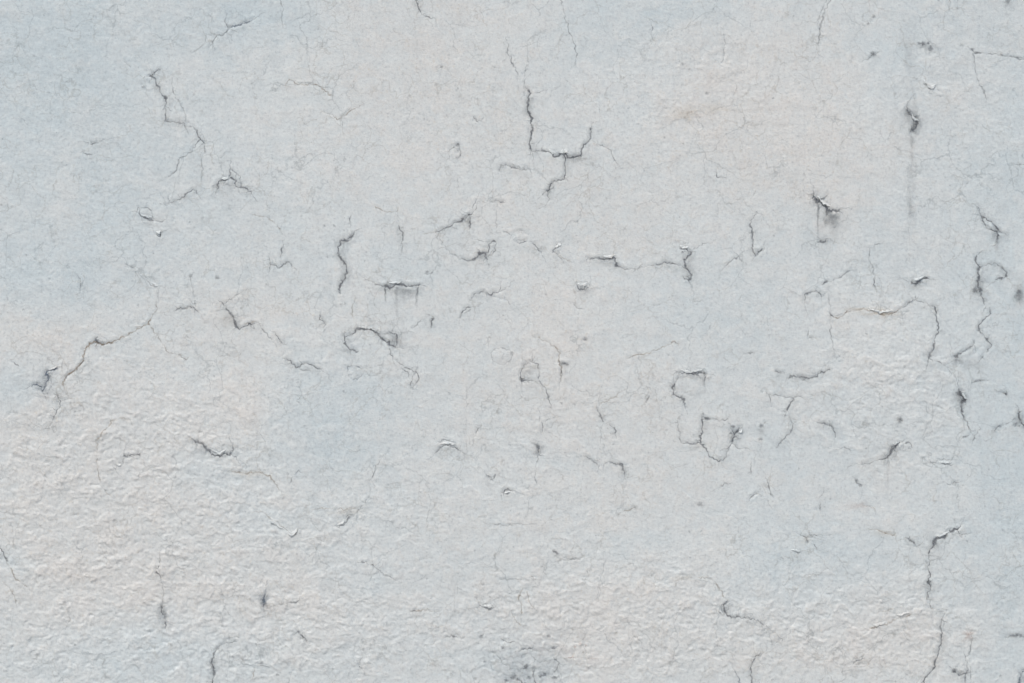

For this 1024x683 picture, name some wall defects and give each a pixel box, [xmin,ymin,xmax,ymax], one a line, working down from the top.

crack [527,90,591,192]
crack [982,217,999,238]
crack [385,281,419,289]
crack [593,255,619,267]
crack [975,256,1007,344]
crack [344,326,397,351]
crack [862,300,961,362]
crack [34,339,113,402]
crack [672,369,742,462]
crack [195,441,231,457]
crack [910,526,961,586]